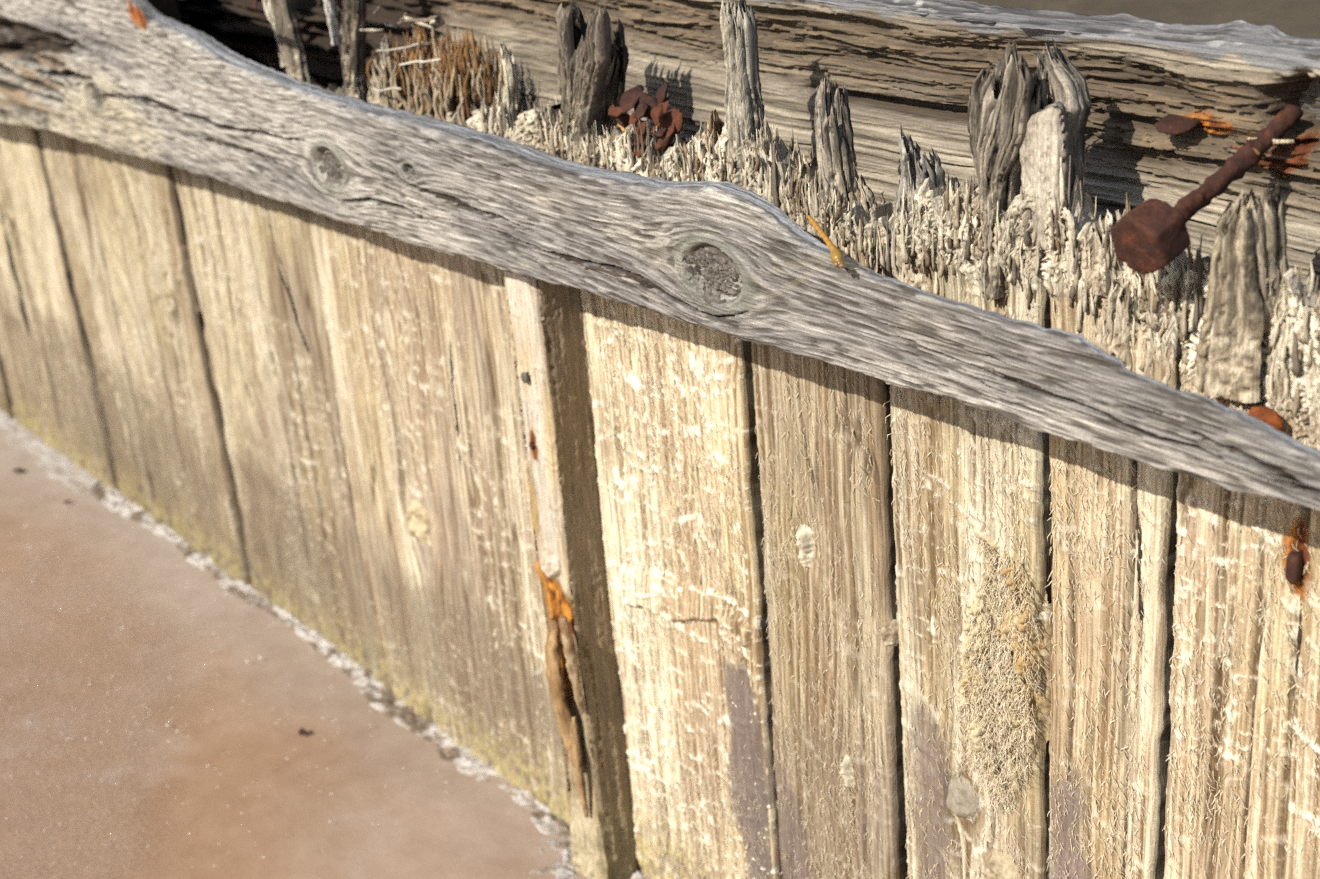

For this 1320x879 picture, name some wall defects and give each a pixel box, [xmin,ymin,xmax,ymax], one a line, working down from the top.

crack [0,22,291,163]
corrosion [1153,113,1231,136]
corrosion [1258,131,1320,177]
corrosion [529,430,538,531]
corrosion [1282,519,1312,601]
corrosion [534,562,575,709]